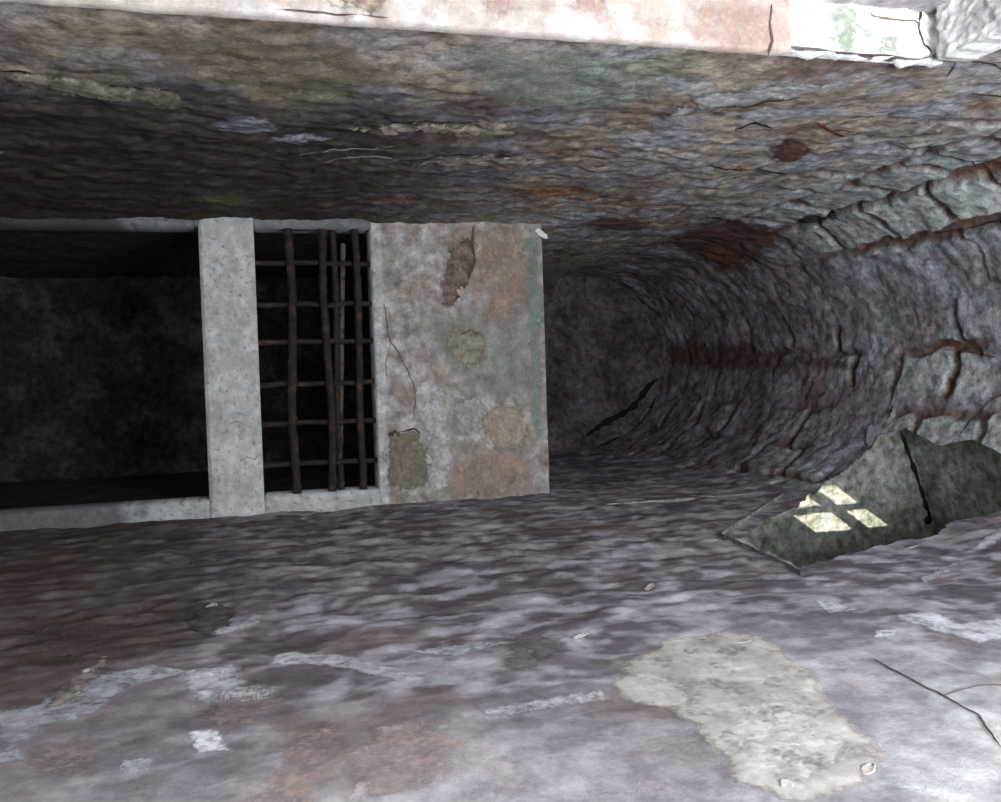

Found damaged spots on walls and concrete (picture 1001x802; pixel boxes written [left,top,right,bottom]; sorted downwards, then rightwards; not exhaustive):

flaking render [328,0,386,15]
crack [735,122,773,130]
crack [816,122,854,137]
crack [707,165,788,174]
crack [900,141,1001,184]
crack [934,220,1001,234]
flaking render [440,225,476,307]
crack [945,349,997,358]
crack [586,377,659,448]
crack [962,394,1001,432]
crack [900,431,932,525]
flaking render [614,631,886,802]